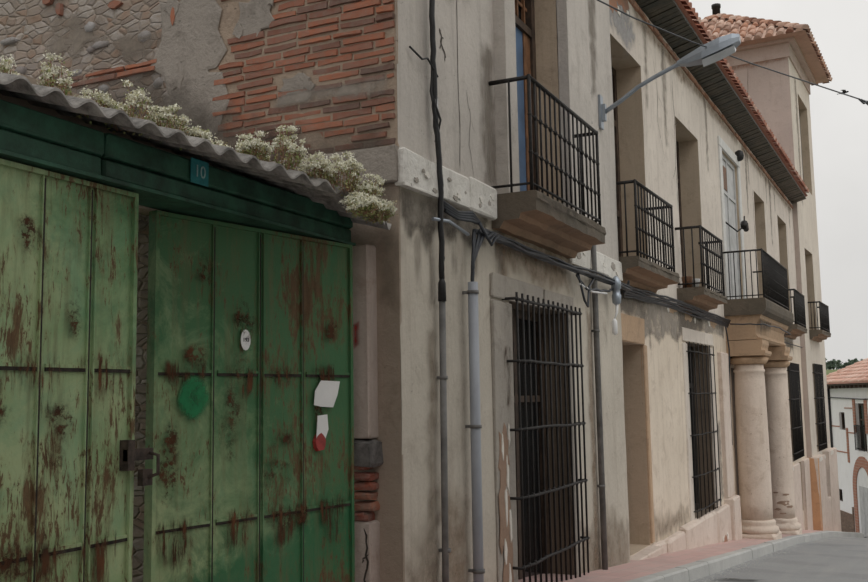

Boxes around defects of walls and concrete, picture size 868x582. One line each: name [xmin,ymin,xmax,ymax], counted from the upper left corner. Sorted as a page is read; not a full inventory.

rust [21,216,36,249]
rust [315,365,334,381]
rust [19,356,72,467]
rust [159,426,178,494]
peeling [498,423,514,582]
rust [0,541,59,582]
rust [80,534,116,582]
rust [157,519,192,569]
crack [361,529,369,582]